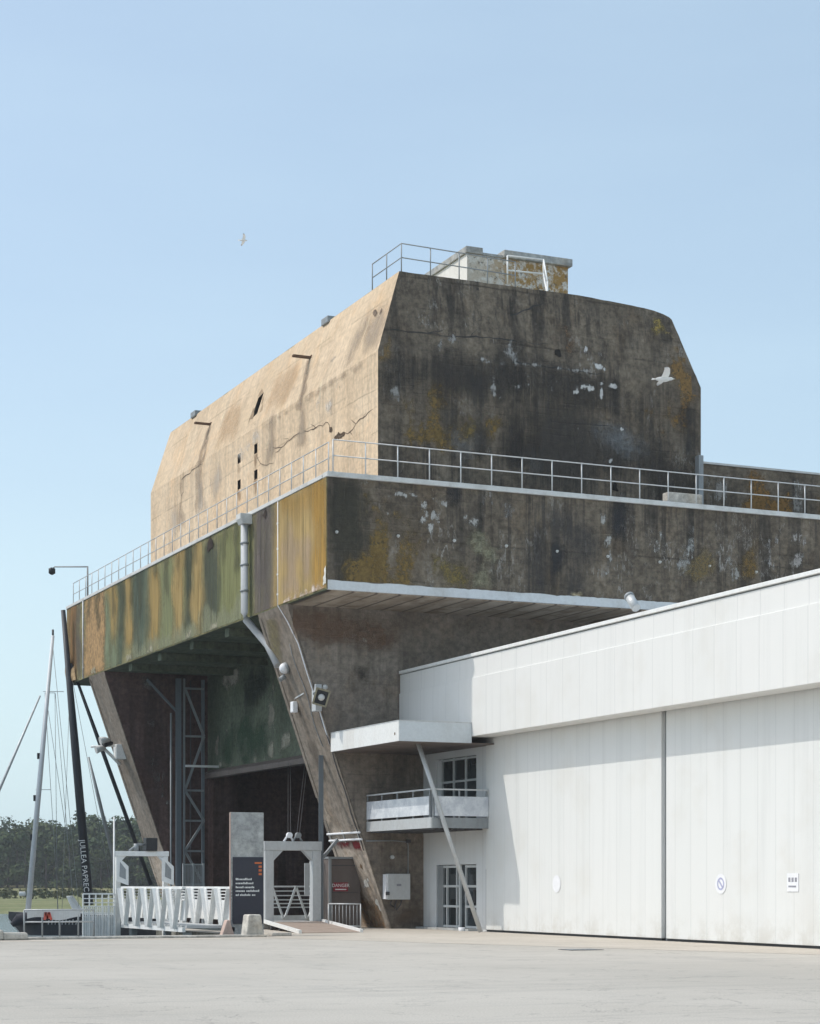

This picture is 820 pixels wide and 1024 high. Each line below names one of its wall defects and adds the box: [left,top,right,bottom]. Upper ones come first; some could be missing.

crack [256,410,371,466]
damp [385,334,682,492]
damp [341,488,460,585]
damp [601,502,625,574]
damp [131,546,192,659]
damp [203,549,219,632]